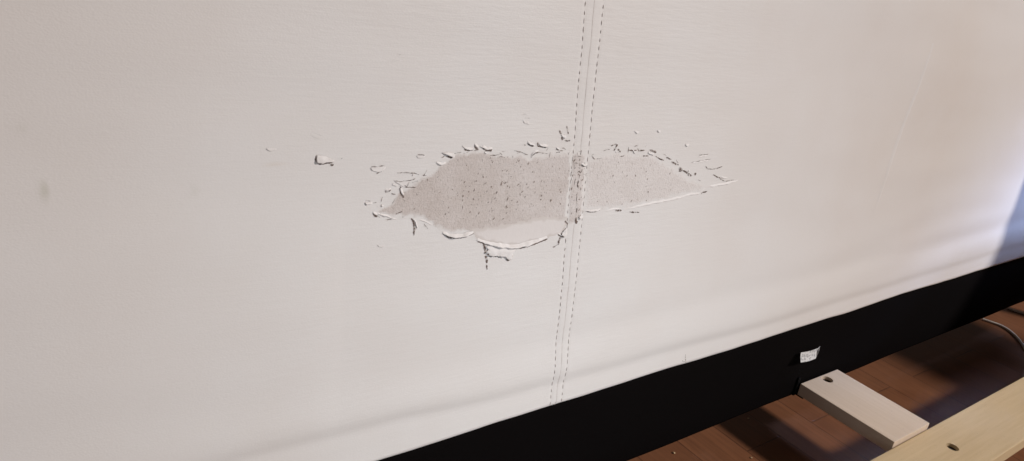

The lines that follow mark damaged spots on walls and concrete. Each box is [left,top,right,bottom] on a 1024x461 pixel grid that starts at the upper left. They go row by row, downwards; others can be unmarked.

peeling [365,141,583,249]